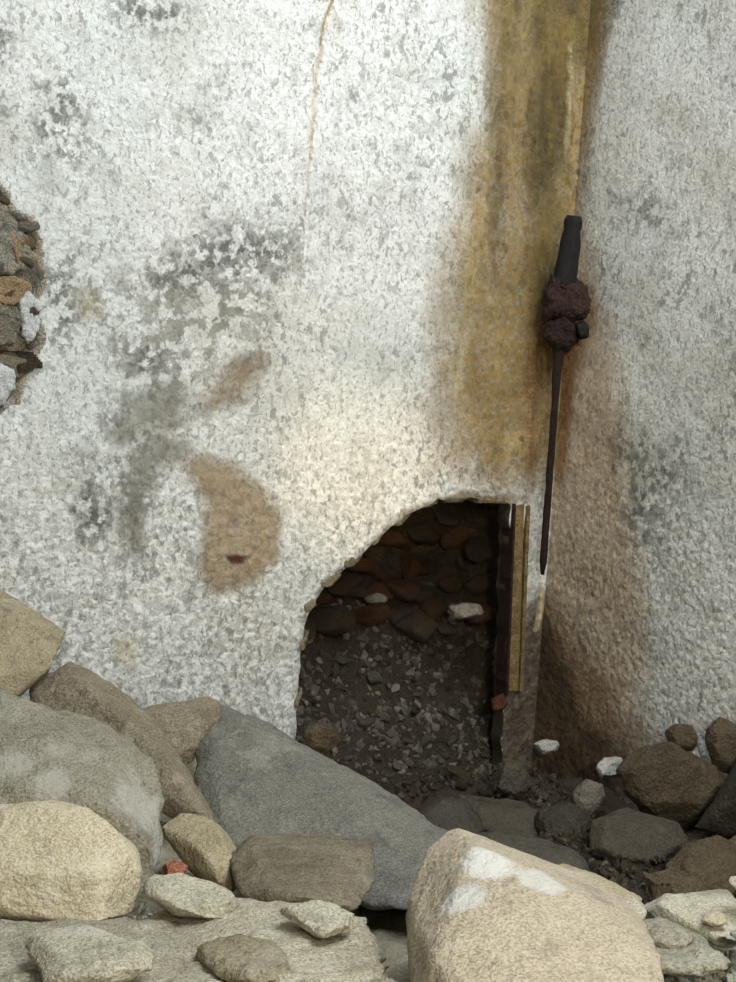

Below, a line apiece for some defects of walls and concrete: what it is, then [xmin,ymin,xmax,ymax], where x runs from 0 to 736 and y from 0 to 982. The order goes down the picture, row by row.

spalling [0,185,48,413]
water stain [443,0,619,484]
water stain [119,235,295,548]
water stain [75,497,109,538]
water stain [190,458,279,590]
spalling [300,629,309,651]
spalling [304,599,316,612]
spalling [320,554,363,588]